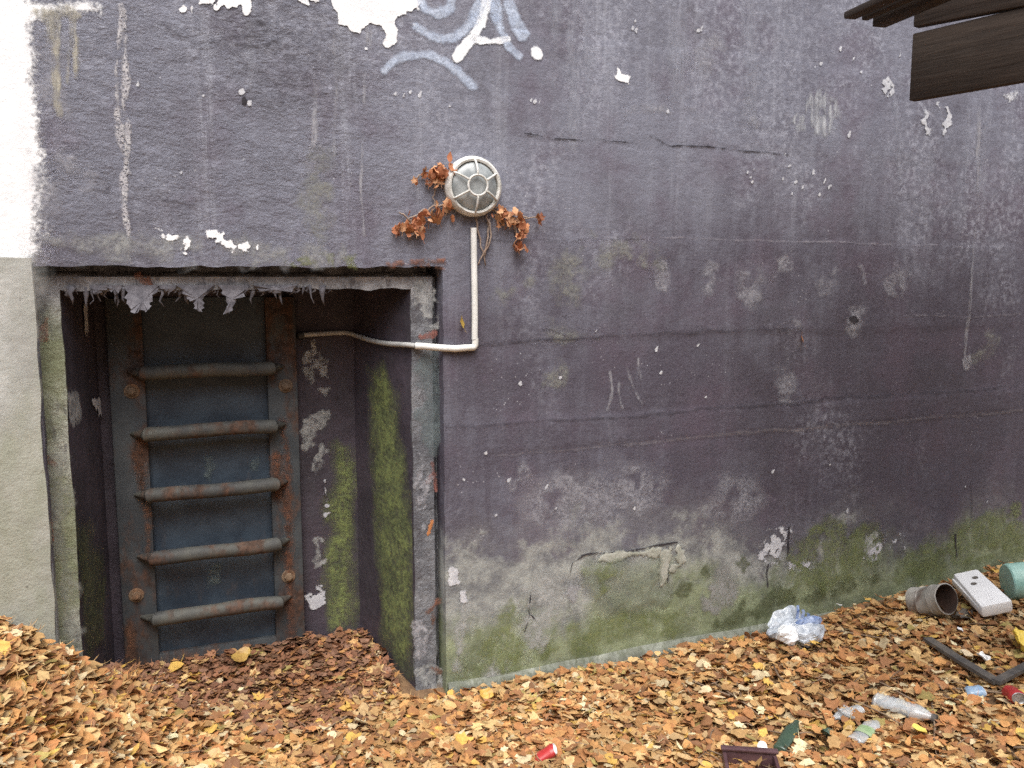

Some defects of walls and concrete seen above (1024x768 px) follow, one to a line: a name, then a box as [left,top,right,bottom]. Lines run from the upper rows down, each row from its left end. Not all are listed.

peeling [179,0,252,16]
peeling [299,0,420,48]
water stain [104,3,174,259]
crack [525,133,788,156]
peeling [921,102,952,135]
peeling [155,228,191,255]
peeling [206,230,259,253]
peeling [84,285,297,336]
water stain [758,526,814,569]
water stain [863,528,905,563]
peeling [305,585,326,610]
water stain [448,567,469,670]